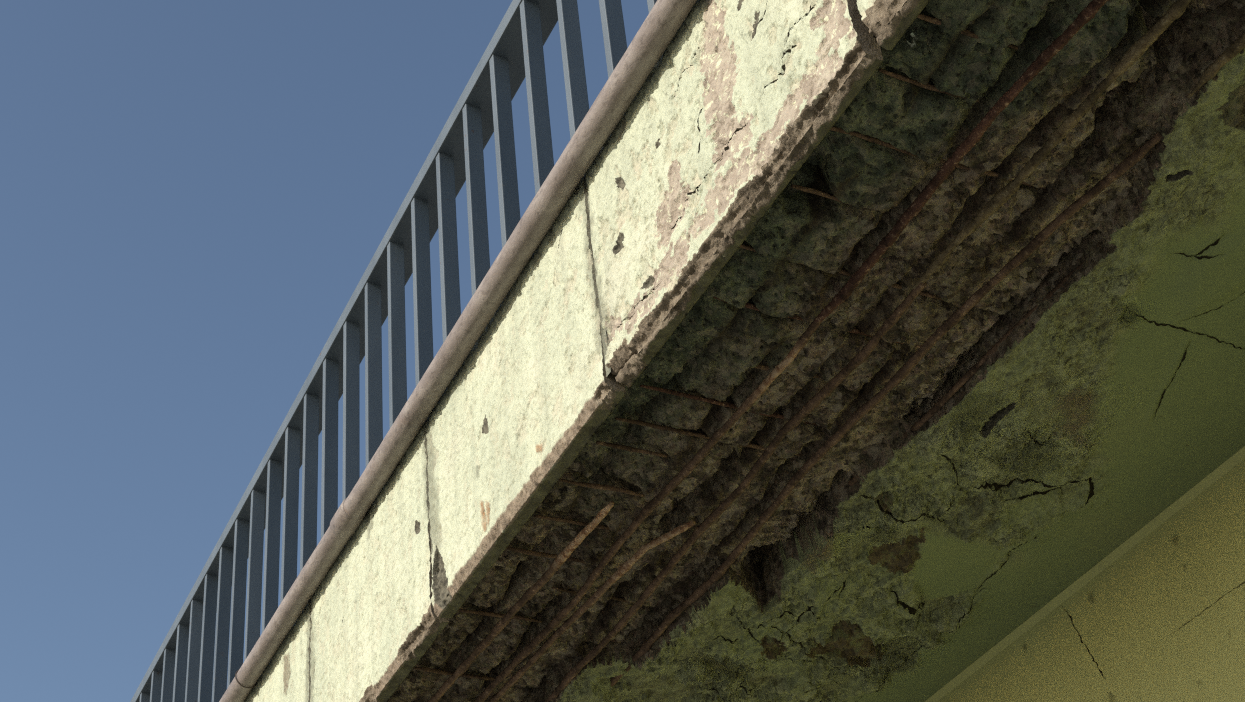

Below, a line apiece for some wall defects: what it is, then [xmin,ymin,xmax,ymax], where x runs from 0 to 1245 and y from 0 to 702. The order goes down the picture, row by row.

crack [1170,238,1223,260]
spalling [359,0,1245,702]
crack [1122,292,1245,420]